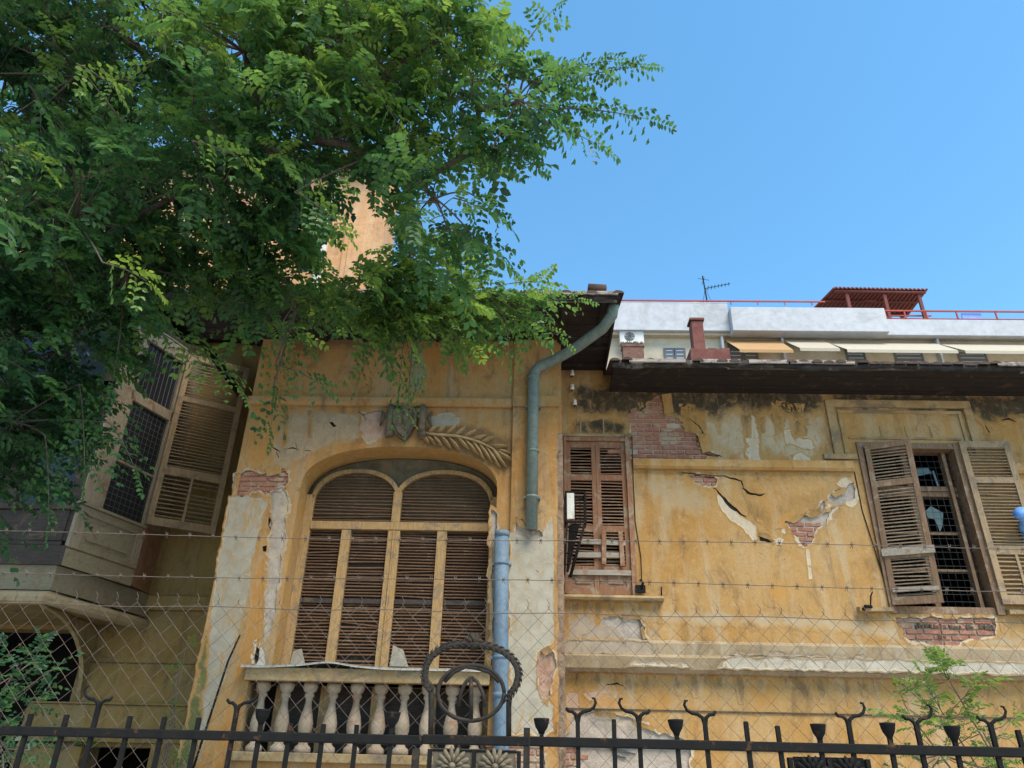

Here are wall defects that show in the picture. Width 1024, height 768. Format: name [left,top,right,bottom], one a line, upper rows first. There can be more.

peeling [425,411,461,428]
crack [684,419,762,517]
flaking render [607,393,860,549]
damp [565,379,1024,451]
peeling [195,407,386,768]
peeling [486,433,1024,768]